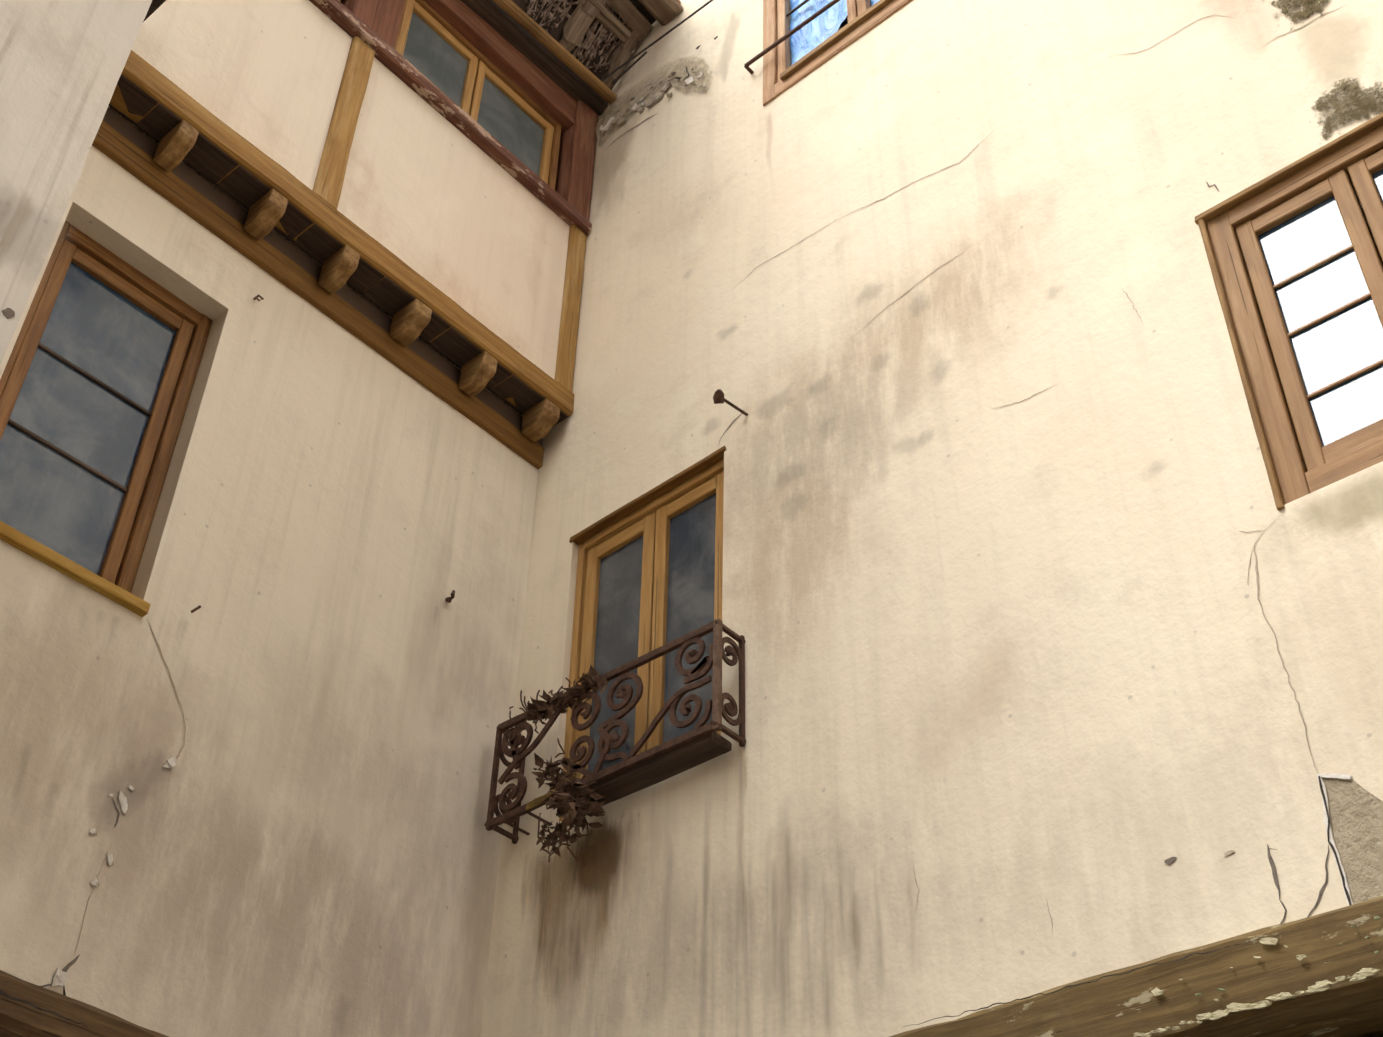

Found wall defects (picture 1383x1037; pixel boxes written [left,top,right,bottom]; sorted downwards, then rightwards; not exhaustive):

flaking render [597,36,718,149]
crack [147,619,186,768]
crack [1239,518,1319,774]
spalling [1317,773,1383,906]
crack [0,856,107,1027]
peeling [1133,925,1381,1037]